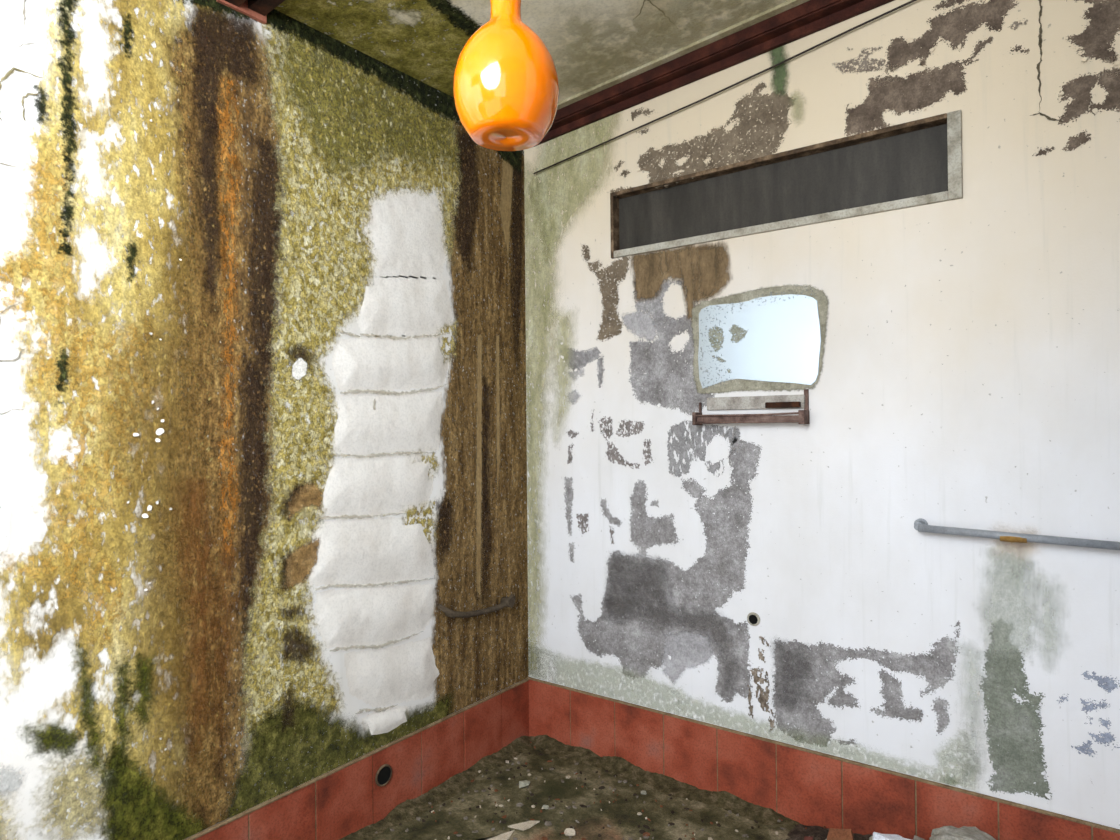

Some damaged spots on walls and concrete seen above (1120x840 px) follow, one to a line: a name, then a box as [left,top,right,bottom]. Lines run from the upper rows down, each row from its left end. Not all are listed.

crack [0,0,46,121]
peeling [608,82,798,197]
peeling [836,0,1028,136]
crack [1030,0,1063,122]
peeling [1032,0,1120,156]
corrosion [216,77,241,561]
damp [0,9,291,840]
damp [404,115,613,714]
peeling [557,243,960,748]
peeling [979,617,1120,800]